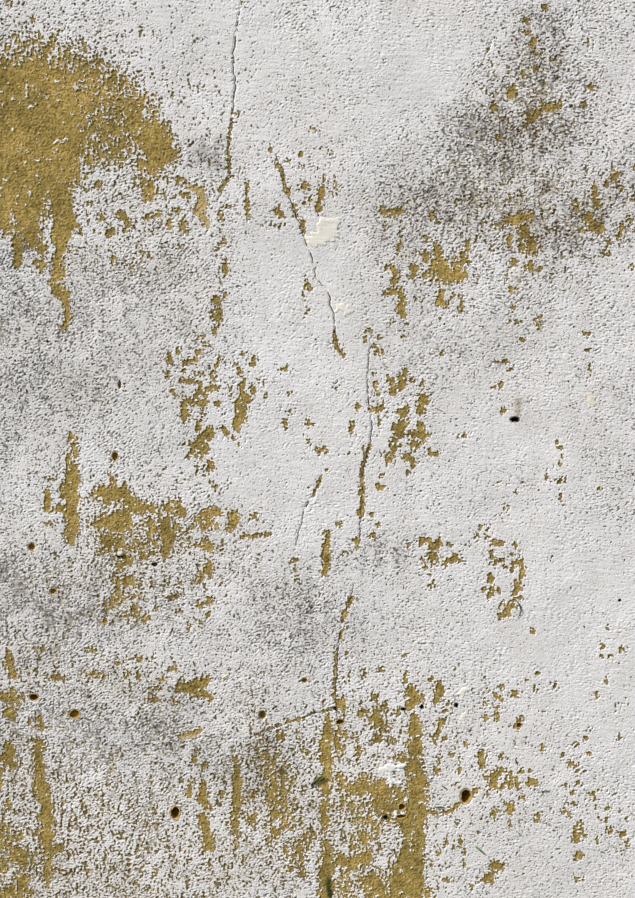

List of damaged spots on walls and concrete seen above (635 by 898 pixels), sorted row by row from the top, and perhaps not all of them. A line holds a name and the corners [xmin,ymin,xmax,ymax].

peeling [0,15,268,493]
crack [213,0,243,200]
crack [268,144,346,358]
water stain [398,170,505,235]
water stain [478,94,574,181]
water stain [518,187,626,253]
peeling [40,431,273,633]
crack [206,584,355,747]
crack [356,336,374,538]
peeling [372,368,442,492]
peeling [404,524,528,621]
peeling [178,653,541,898]